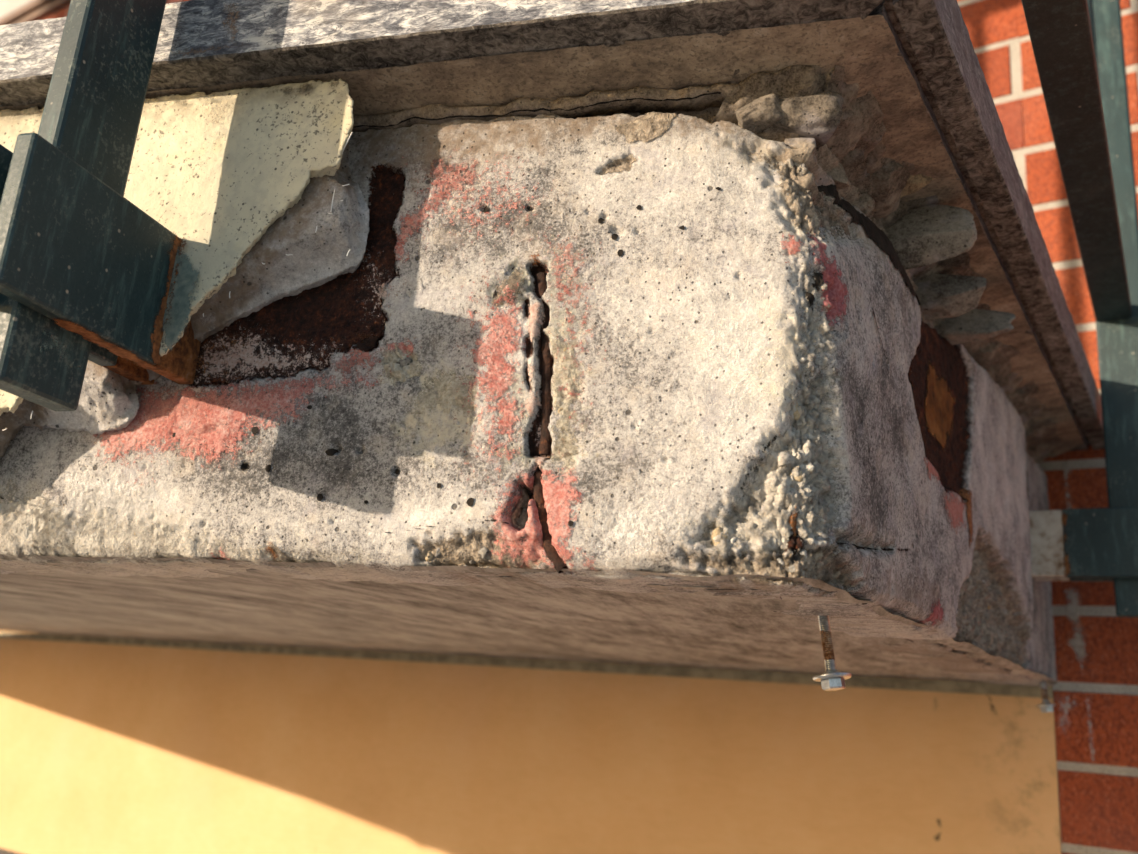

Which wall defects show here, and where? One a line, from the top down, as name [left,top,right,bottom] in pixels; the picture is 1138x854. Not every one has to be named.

crack [353,92,721,128]
rust [189,164,409,397]
crack [817,184,921,305]
crack [493,254,568,573]
rust [908,318,975,551]